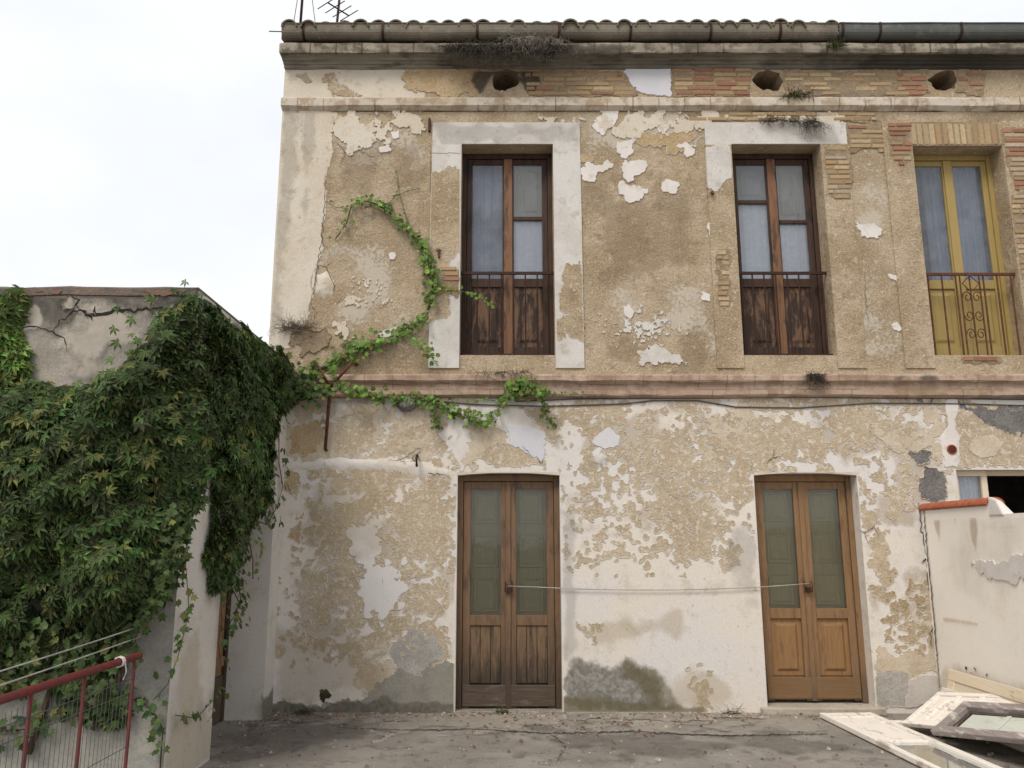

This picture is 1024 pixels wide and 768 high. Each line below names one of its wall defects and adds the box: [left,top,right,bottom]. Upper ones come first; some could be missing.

flaking render [630,111,913,199]
crack [23,295,164,351]
flaking render [556,261,688,348]
flaking render [272,398,1024,714]
water stain [563,658,663,707]